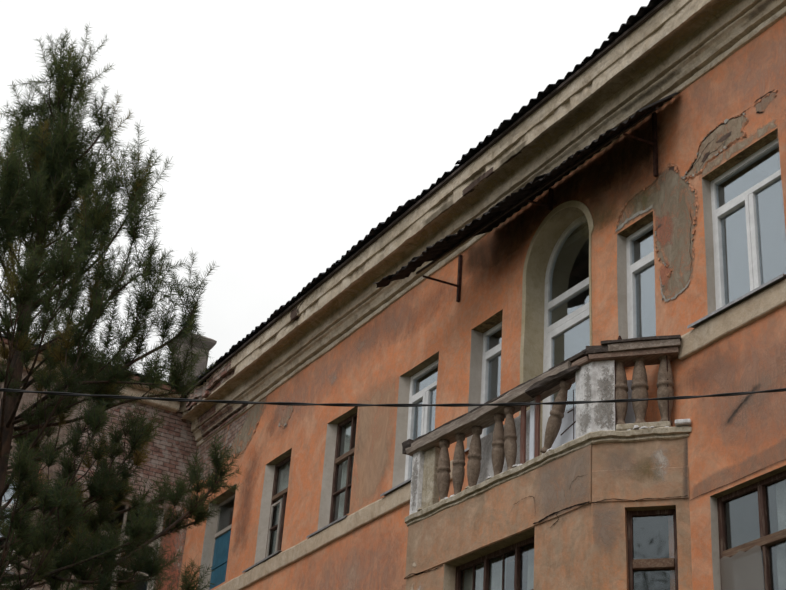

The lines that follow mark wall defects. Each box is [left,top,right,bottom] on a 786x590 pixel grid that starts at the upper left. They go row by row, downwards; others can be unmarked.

flaking render [615,89,778,302]
crack [513,475,688,528]